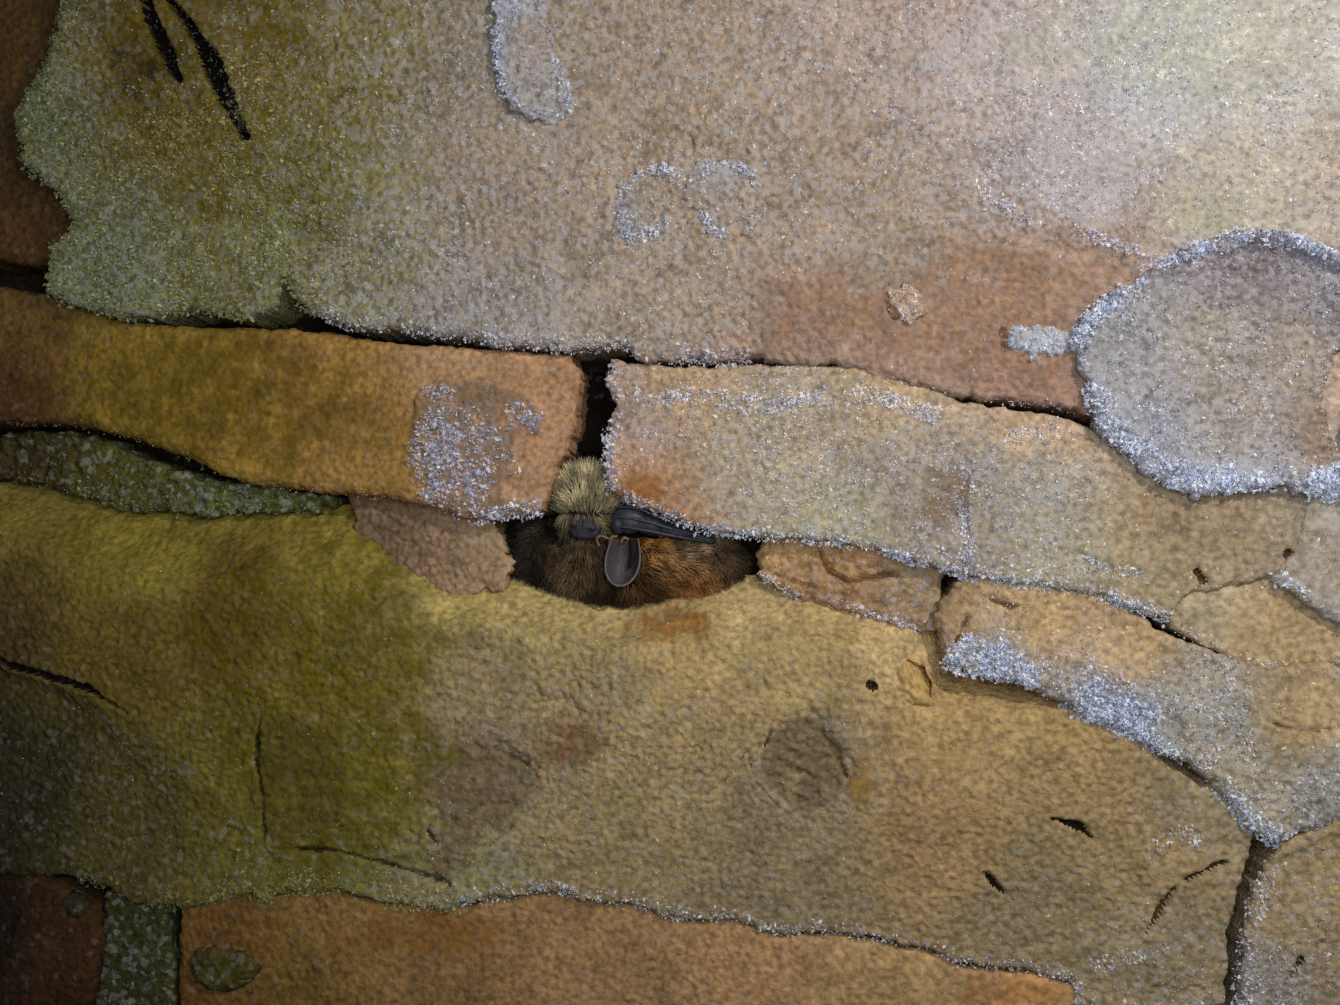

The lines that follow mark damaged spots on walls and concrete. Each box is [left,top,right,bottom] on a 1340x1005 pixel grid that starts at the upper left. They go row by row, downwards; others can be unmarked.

crack [140,0,250,140]
crack [0,428,242,482]
crack [0,658,127,713]